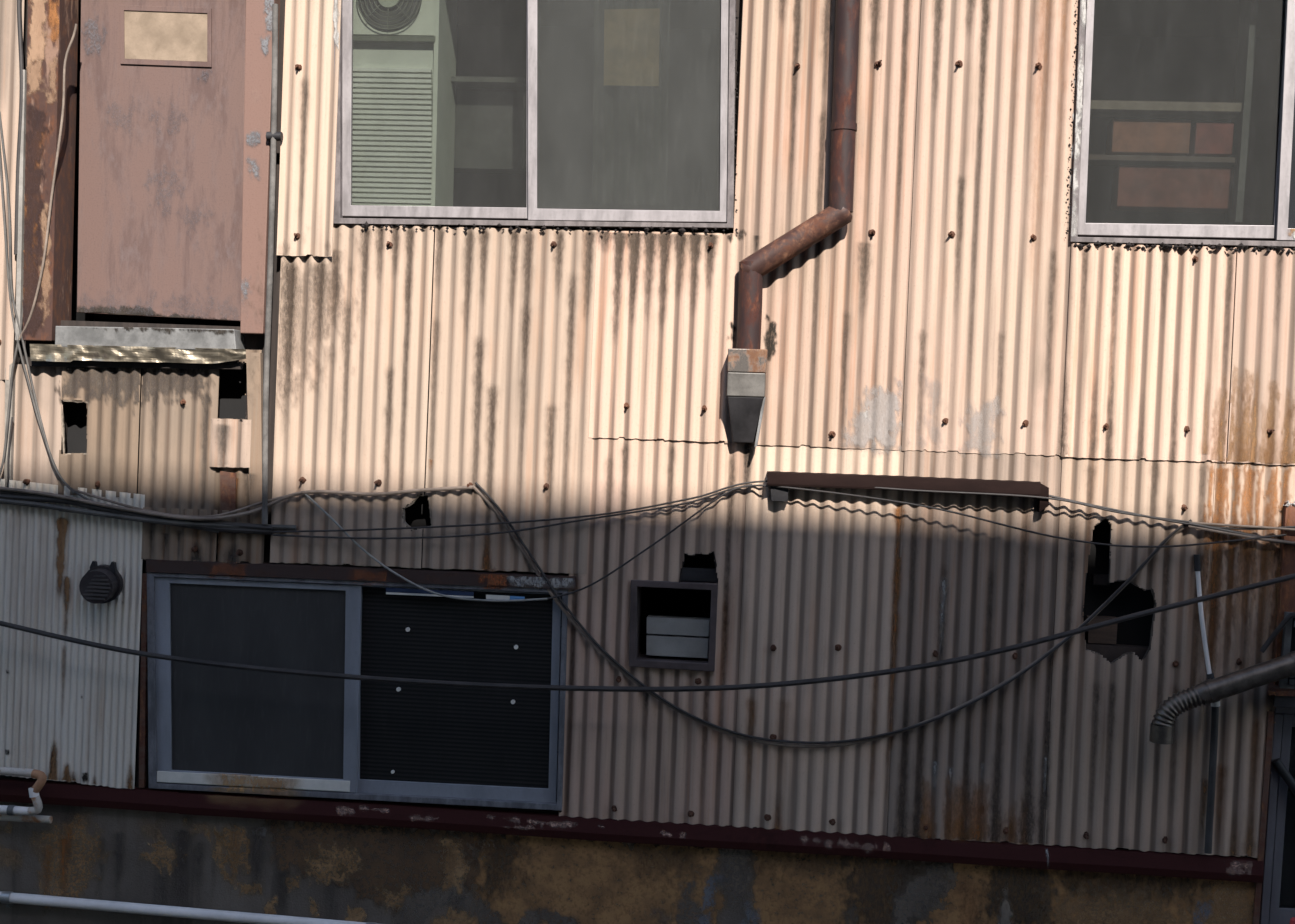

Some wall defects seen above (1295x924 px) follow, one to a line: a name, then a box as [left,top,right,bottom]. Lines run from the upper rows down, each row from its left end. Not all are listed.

peeling [237,806,726,924]
peeling [747,838,1255,924]